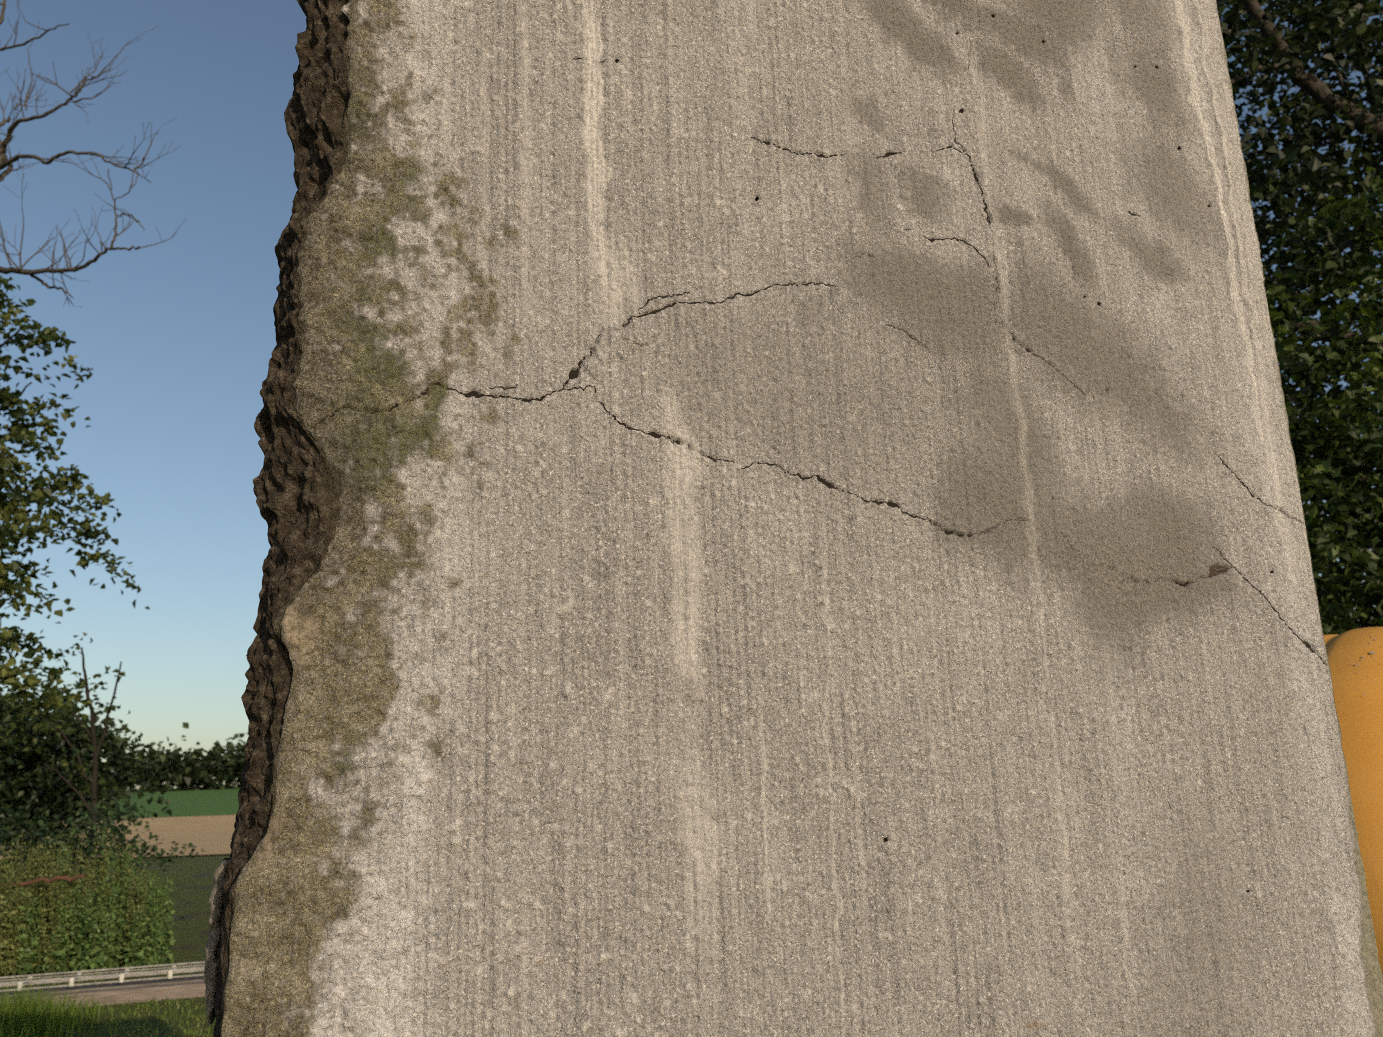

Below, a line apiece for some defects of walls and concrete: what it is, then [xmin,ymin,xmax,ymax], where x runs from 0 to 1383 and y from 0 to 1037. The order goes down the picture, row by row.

crack [751,137,902,158]
crack [907,119,1086,396]
spalling [204,0,351,1037]
crack [310,282,1029,538]
crack [1119,547,1328,666]
crack [1218,456,1304,524]